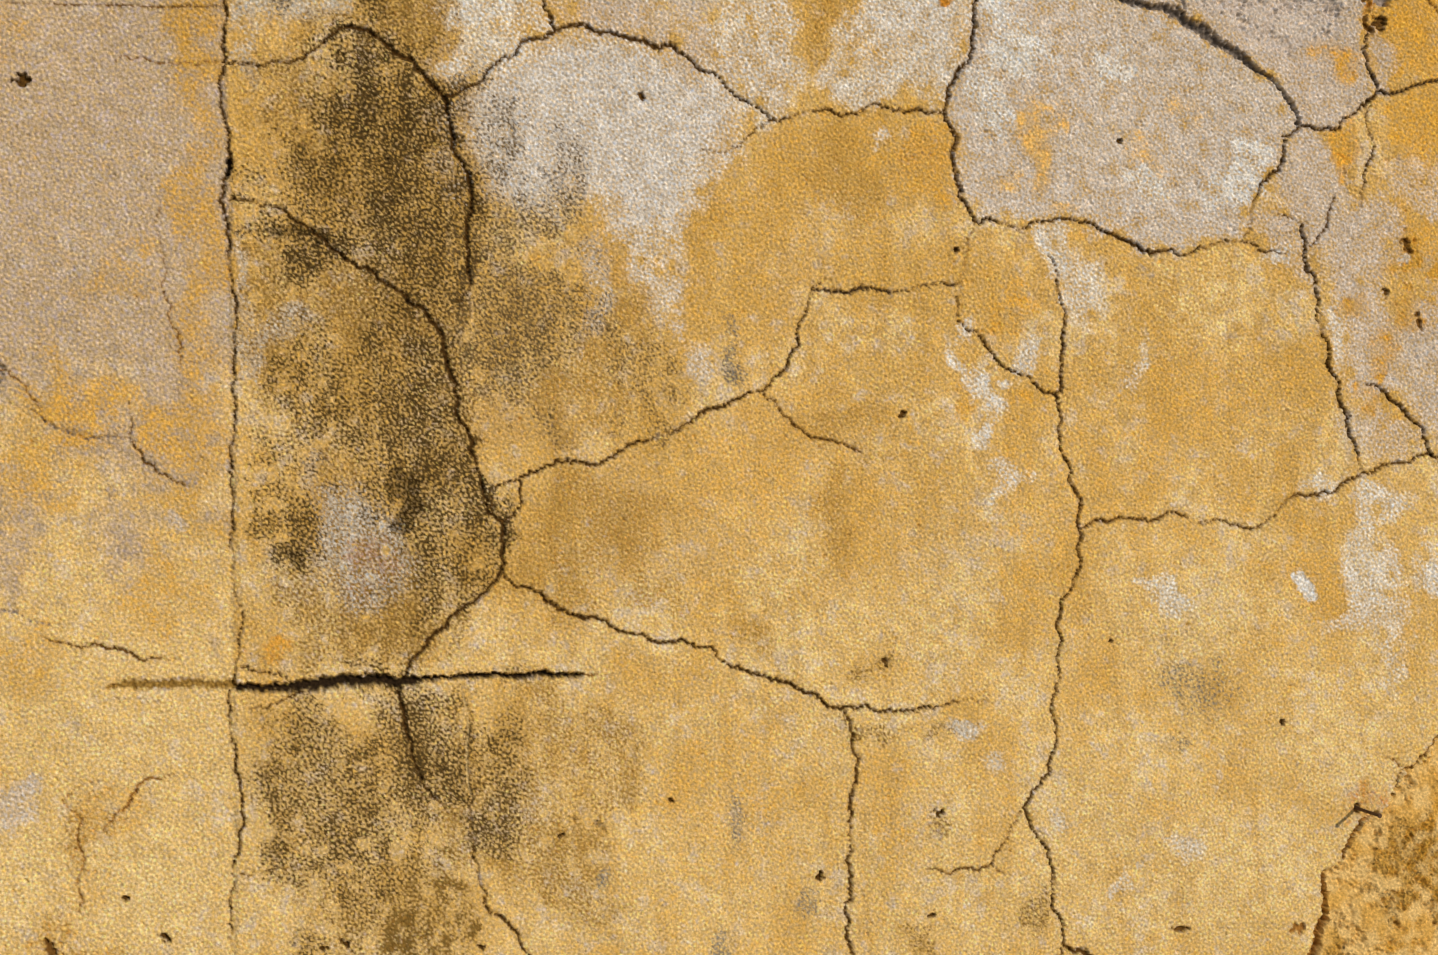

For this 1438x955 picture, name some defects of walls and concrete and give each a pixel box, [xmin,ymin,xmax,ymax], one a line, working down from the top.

crack [0,0,445,160]
leakage [795,0,854,67]
leakage [790,107,888,230]
crack [0,608,180,663]
crack [0,365,187,487]
leakage [215,0,752,955]
crack [104,171,994,955]
leakage [722,609,778,662]
leakage [761,386,890,584]
crack [441,0,1438,955]
crack [61,773,175,914]
spalling [1309,738,1438,955]